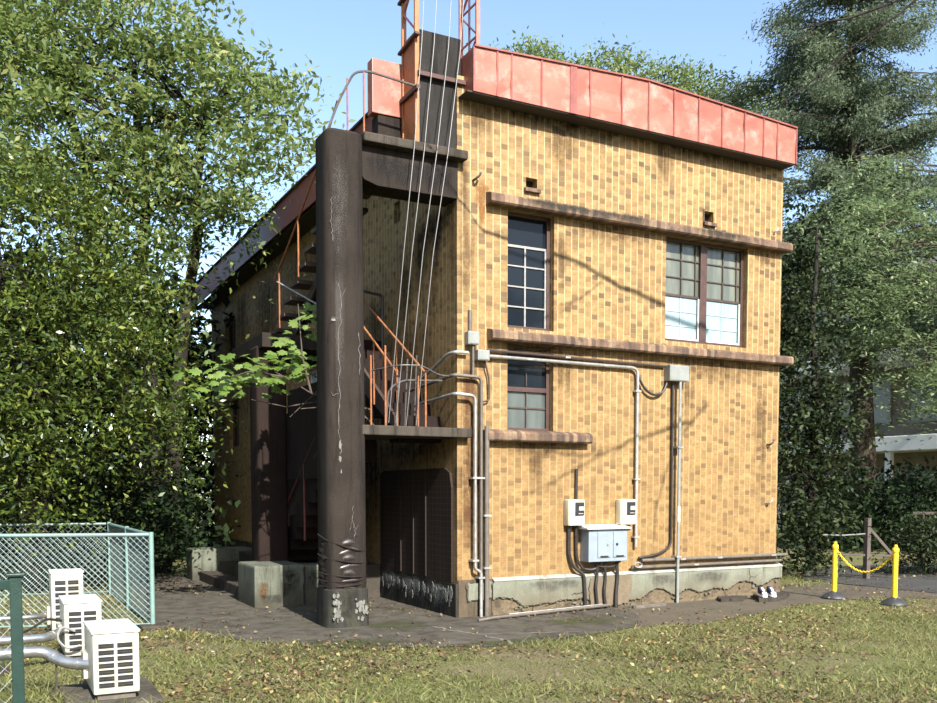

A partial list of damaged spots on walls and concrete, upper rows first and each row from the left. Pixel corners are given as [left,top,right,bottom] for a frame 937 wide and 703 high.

crack [330,285,361,453]
peeling [379,575,453,606]
peeling [466,575,780,615]